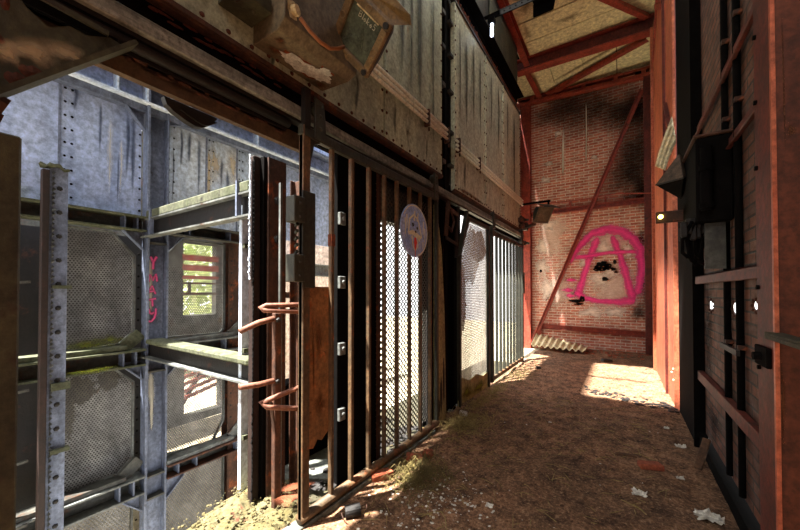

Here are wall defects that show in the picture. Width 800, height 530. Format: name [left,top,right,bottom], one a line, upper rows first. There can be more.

peeling [278,50,334,84]
water stain [117,122,135,190]
water stain [172,133,200,195]